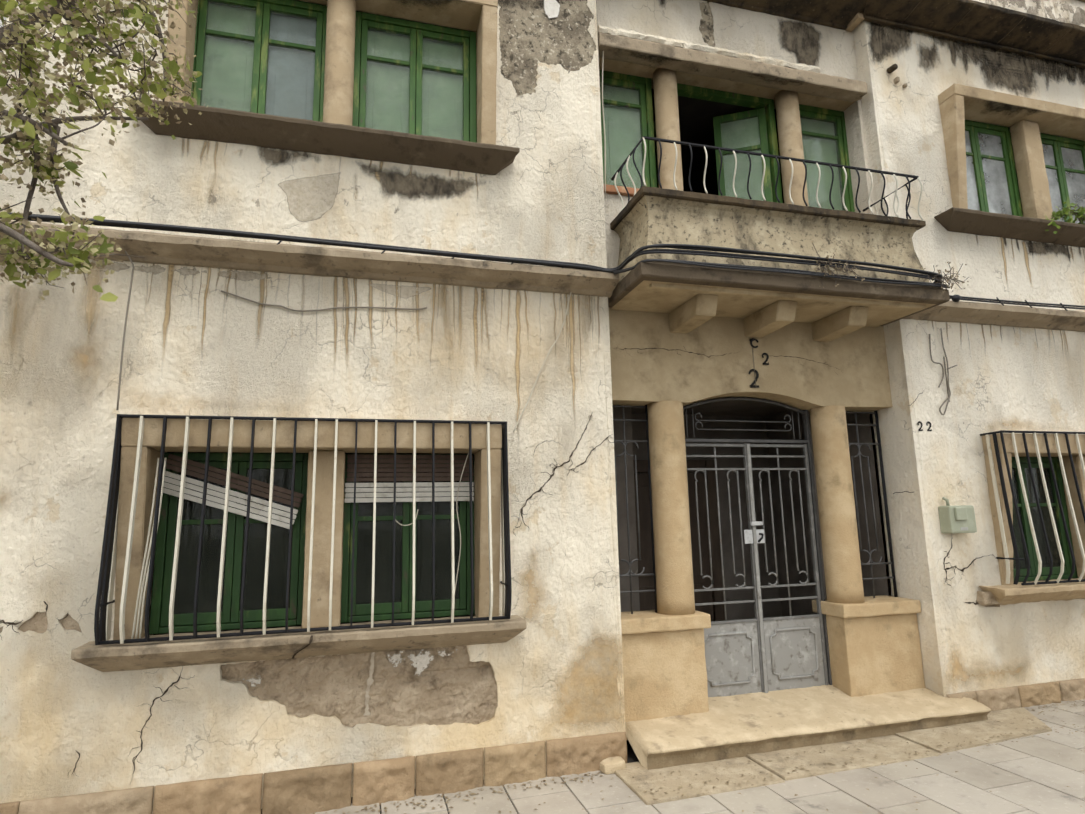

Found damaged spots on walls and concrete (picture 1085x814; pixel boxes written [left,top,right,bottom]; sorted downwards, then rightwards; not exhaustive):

peeling [699,2,715,47]
peeling [498,0,601,109]
water stain [260,147,310,165]
water stain [361,165,474,199]
crack [513,412,616,536]
crack [0,601,68,635]
flaking render [18,611,82,634]
flaking render [221,645,498,728]
crack [128,666,193,778]